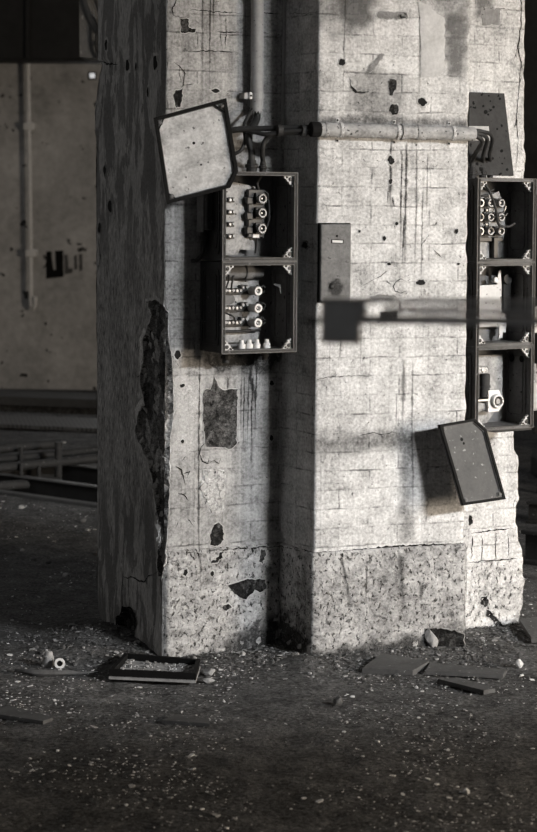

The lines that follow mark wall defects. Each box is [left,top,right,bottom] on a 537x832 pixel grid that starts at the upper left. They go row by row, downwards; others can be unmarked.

leakage [331,0,371,27]
leakage [477,0,491,16]
crack [172,0,239,86]
leakage [446,16,467,74]
spalling [134,296,186,581]
spalling [201,375,239,450]
flaking render [200,468,226,513]
spalling [209,522,225,578]
spalling [115,605,138,637]
spalling [221,578,267,611]